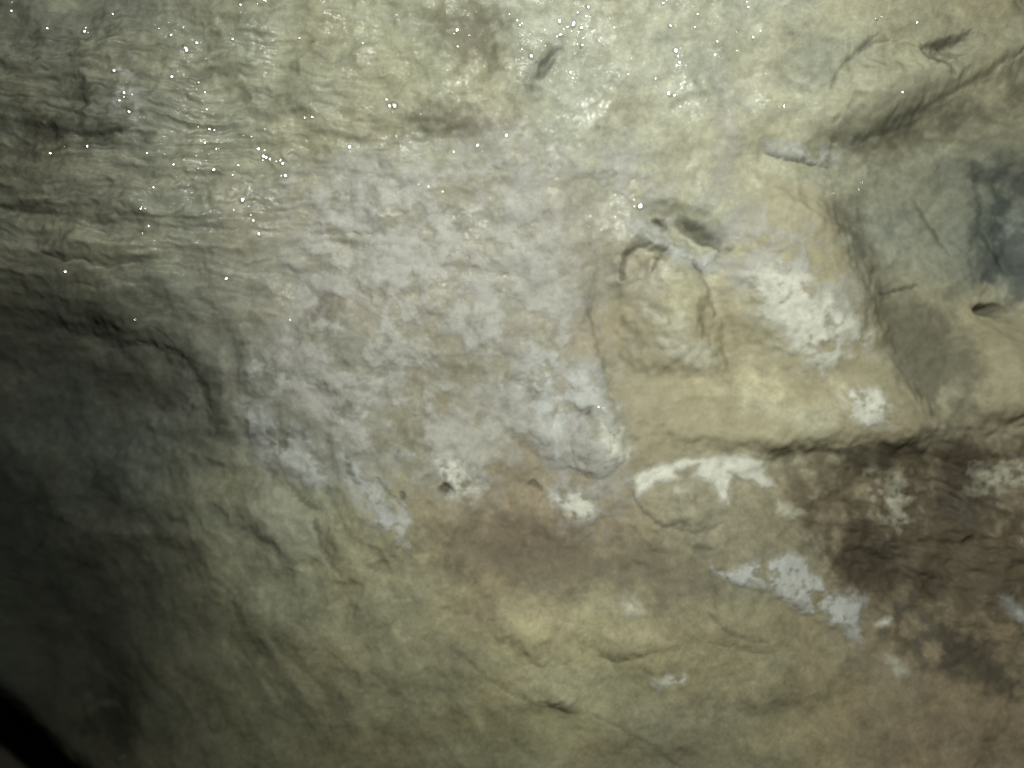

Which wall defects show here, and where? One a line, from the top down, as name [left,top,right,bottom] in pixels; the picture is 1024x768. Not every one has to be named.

leakage [635,220,715,270]
leakage [730,214,870,368]
leakage [849,388,885,426]
leakage [635,456,773,503]
leakage [984,462,1024,486]
leakage [886,494,910,520]
leakage [720,554,862,638]